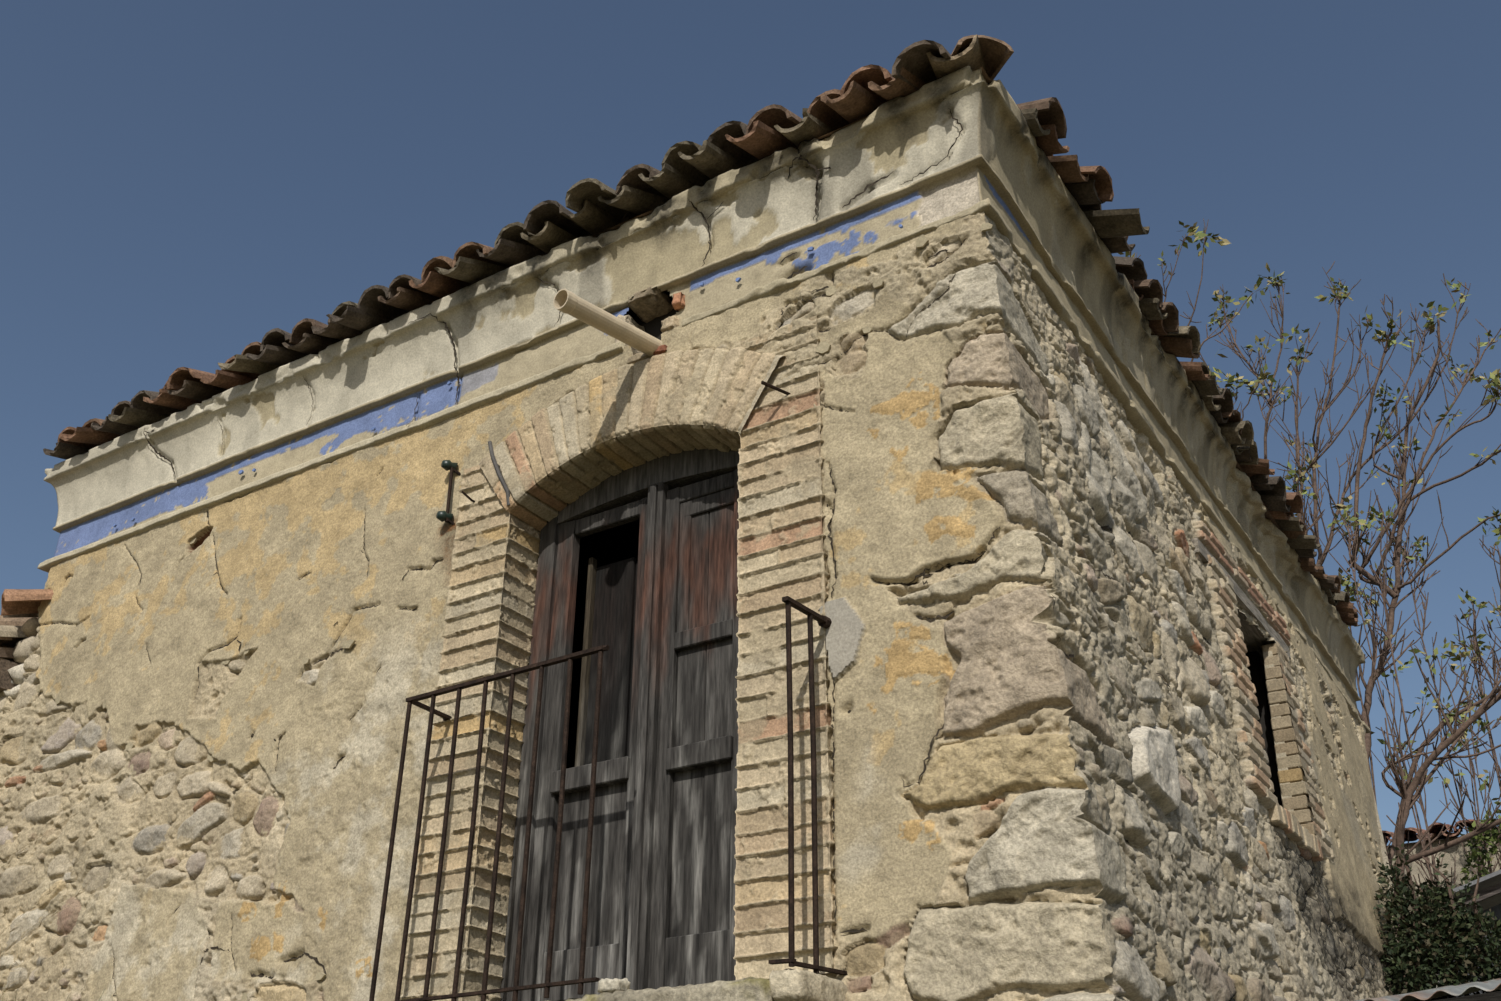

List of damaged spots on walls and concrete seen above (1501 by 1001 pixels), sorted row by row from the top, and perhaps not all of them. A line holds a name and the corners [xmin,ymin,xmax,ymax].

crack [688,199,723,266]
peeling [615,171,994,379]
flaking render [189,531,211,551]
peeling [108,439,305,537]
crack [182,512,242,695]
flaking render [0,650,290,980]